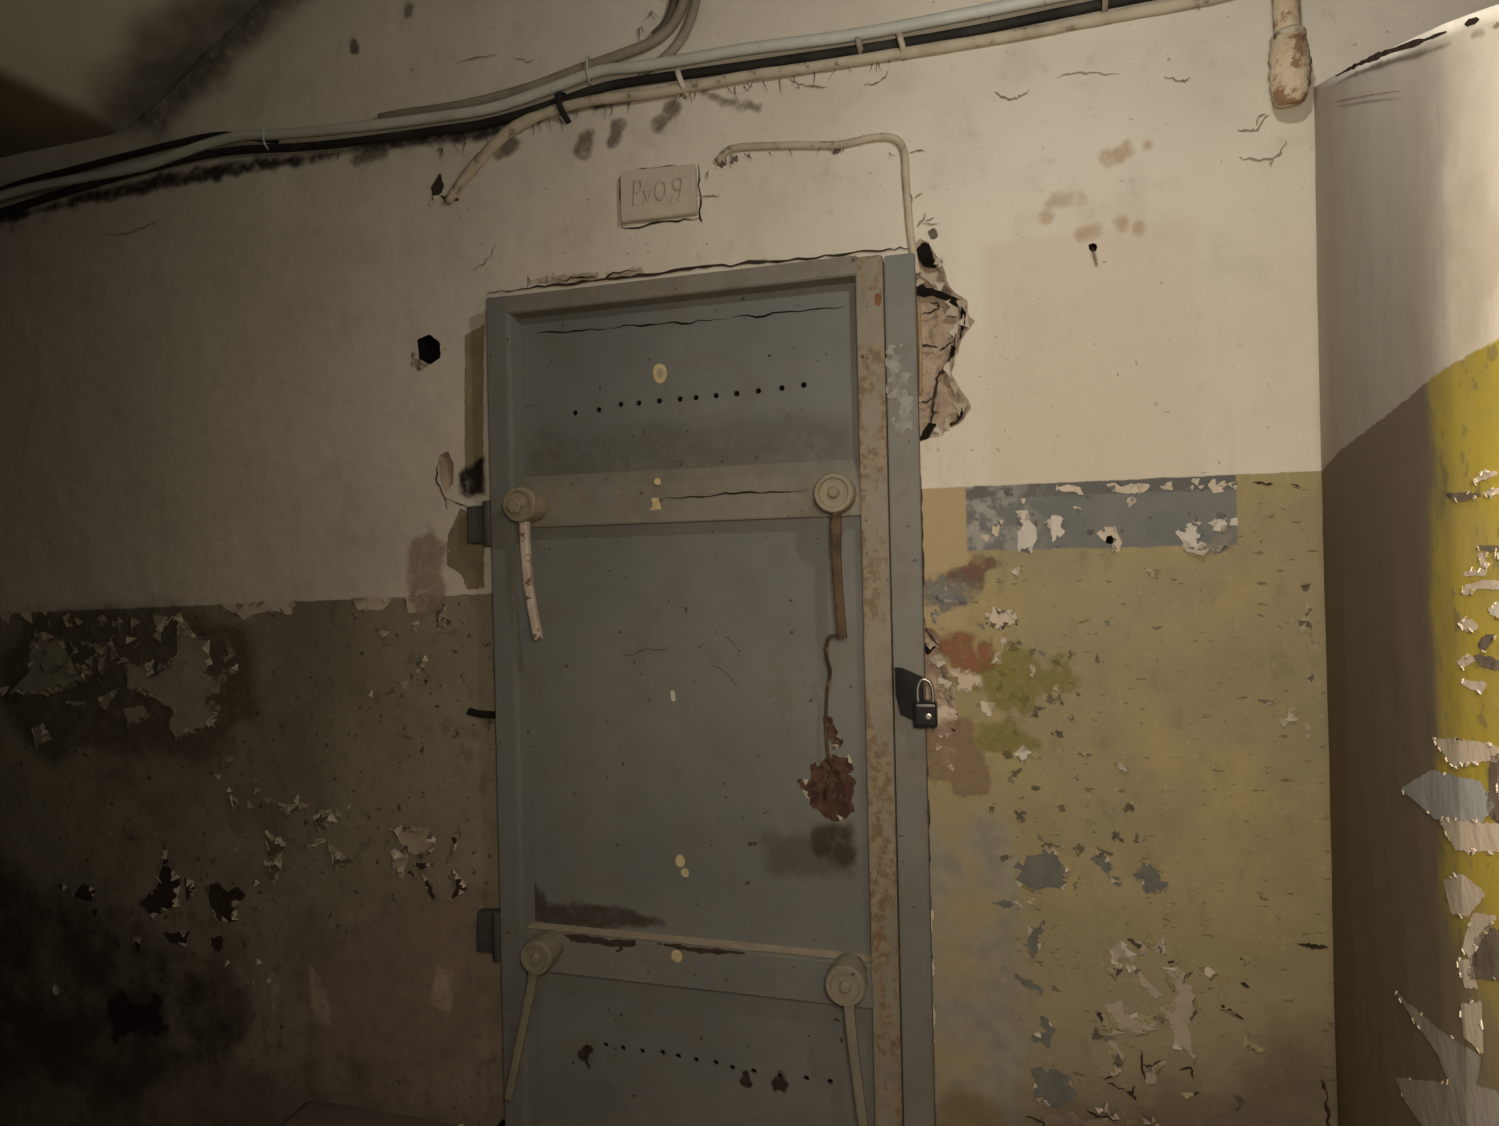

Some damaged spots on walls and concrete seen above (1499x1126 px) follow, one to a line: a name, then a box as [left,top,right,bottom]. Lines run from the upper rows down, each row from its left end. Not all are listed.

crack [1238,113,1287,167]
peeling [981,484,1084,576]
peeling [1107,478,1237,508]
peeling [1176,511,1238,555]
peeling [0,609,238,740]
spalling [924,587,1081,772]
peeling [1457,545,1499,694]
corrosion [797,716,856,822]
peeling [1402,737,1499,855]
peeling [138,749,352,987]
peeling [993,829,1169,958]
peeling [1395,872,1499,1126]